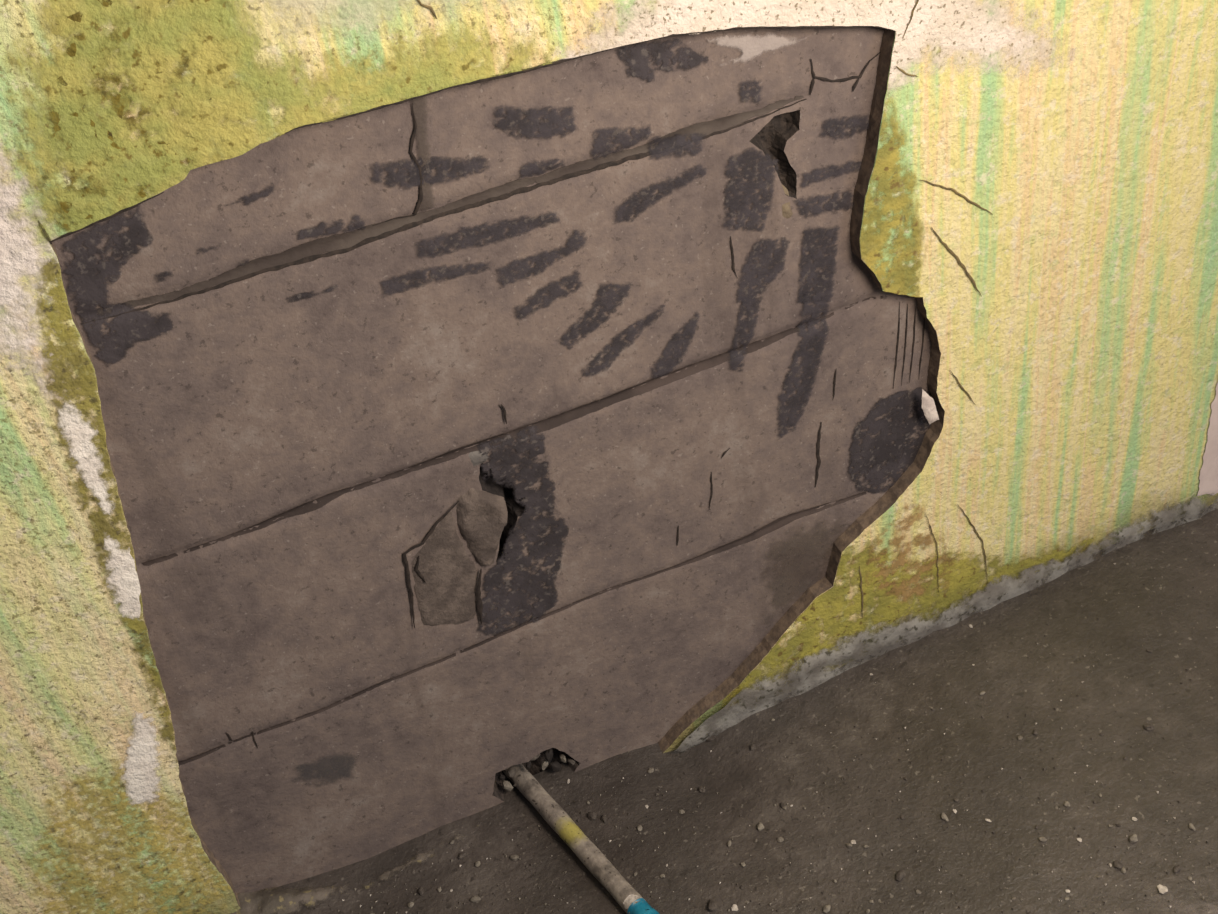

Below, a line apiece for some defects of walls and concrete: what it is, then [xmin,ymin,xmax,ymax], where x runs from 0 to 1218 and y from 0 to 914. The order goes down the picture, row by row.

leakage [543,0,1074,91]
crack [373,104,423,226]
leakage [591,127,707,222]
crack [922,180,993,215]
leakage [381,213,587,319]
leakage [724,110,925,437]
crack [932,228,981,295]
leakage [0,0,532,762]
spalling [38,26,945,908]
leakage [848,387,936,494]
leakage [478,425,569,635]
leakage [670,497,1218,754]